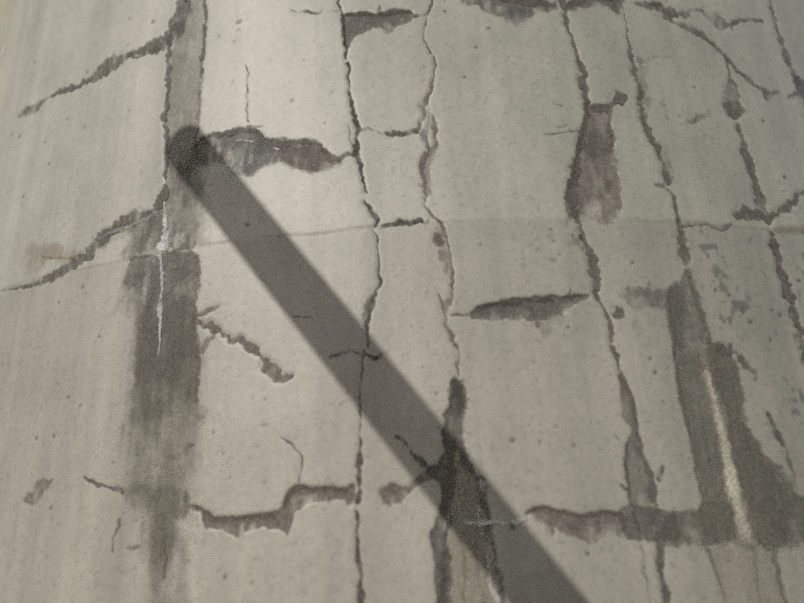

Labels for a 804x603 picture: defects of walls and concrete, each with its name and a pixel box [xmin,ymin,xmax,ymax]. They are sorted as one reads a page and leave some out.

crack [17,21,185,117]
leakage [159,0,354,213]
spalling [340,5,430,48]
crack [622,0,804,362]
leakage [124,215,201,403]
crack [290,0,460,603]
spalling [450,288,589,327]
crack [549,0,681,603]
spalling [190,479,355,537]
leakage [426,377,526,603]
spalling [525,505,627,541]
leakage [663,307,804,581]